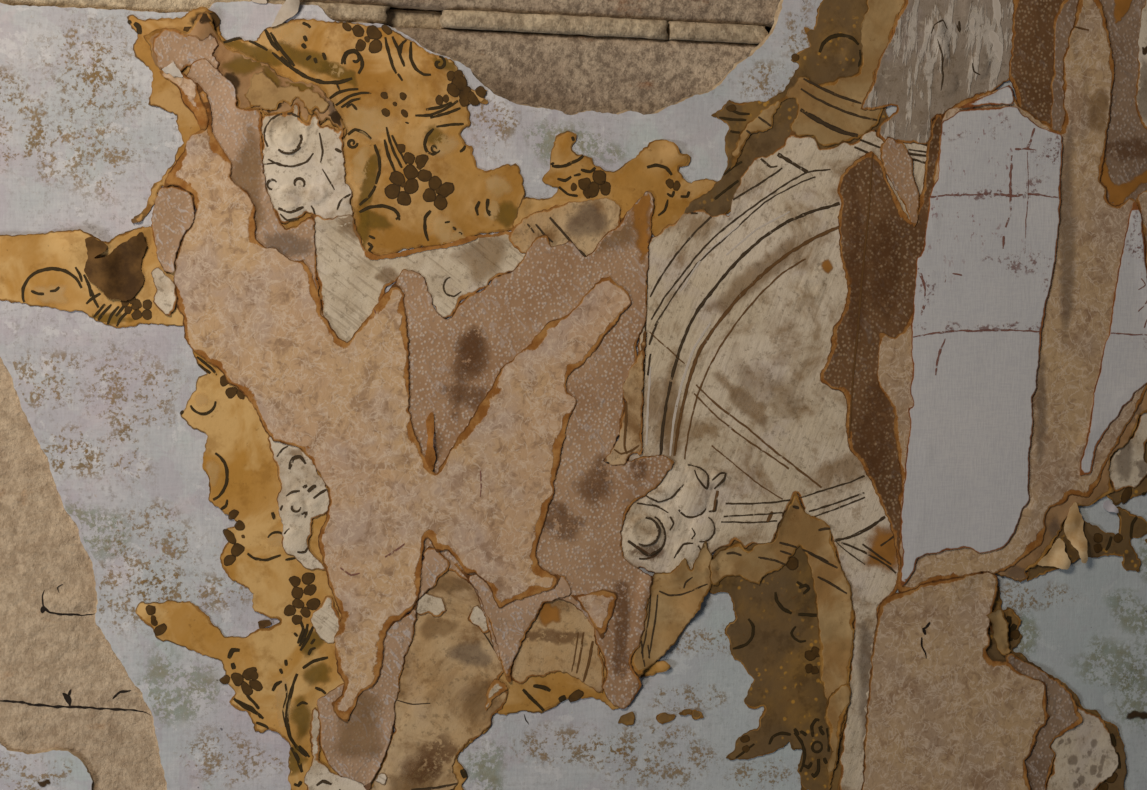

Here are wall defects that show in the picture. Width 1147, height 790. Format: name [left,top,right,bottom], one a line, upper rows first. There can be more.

peeling [271,0,300,27]
flaking render [0,358,166,790]
peeling [631,541,712,679]
crack [0,689,150,715]